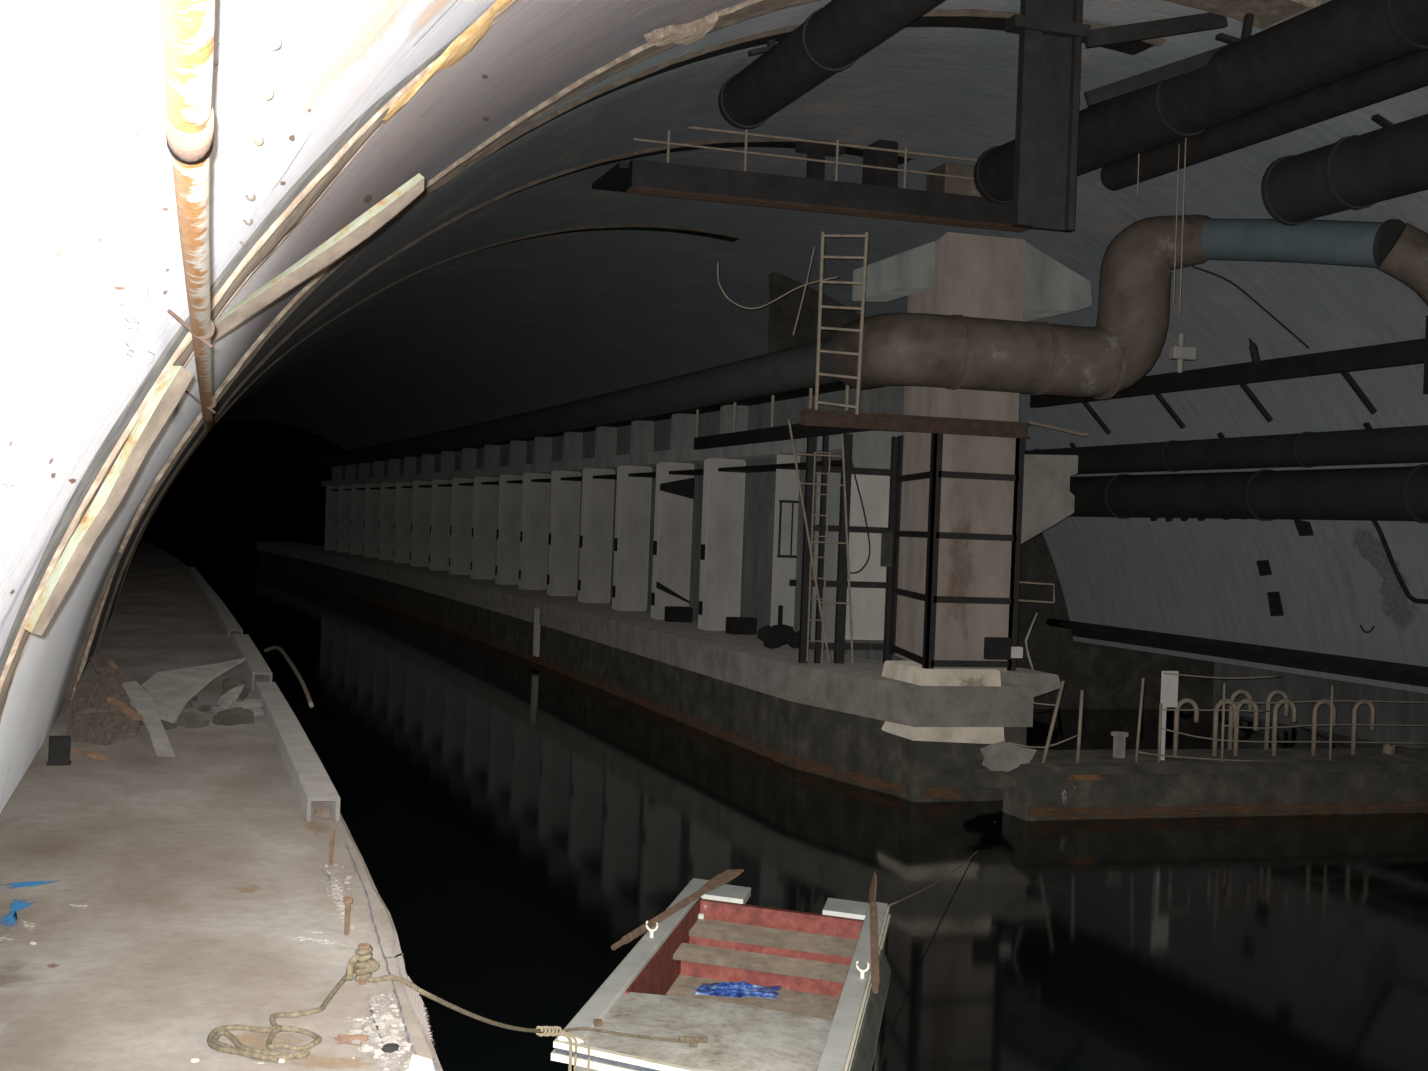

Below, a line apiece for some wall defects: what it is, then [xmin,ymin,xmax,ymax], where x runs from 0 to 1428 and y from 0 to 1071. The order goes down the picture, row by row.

crack [109,260,155,364]